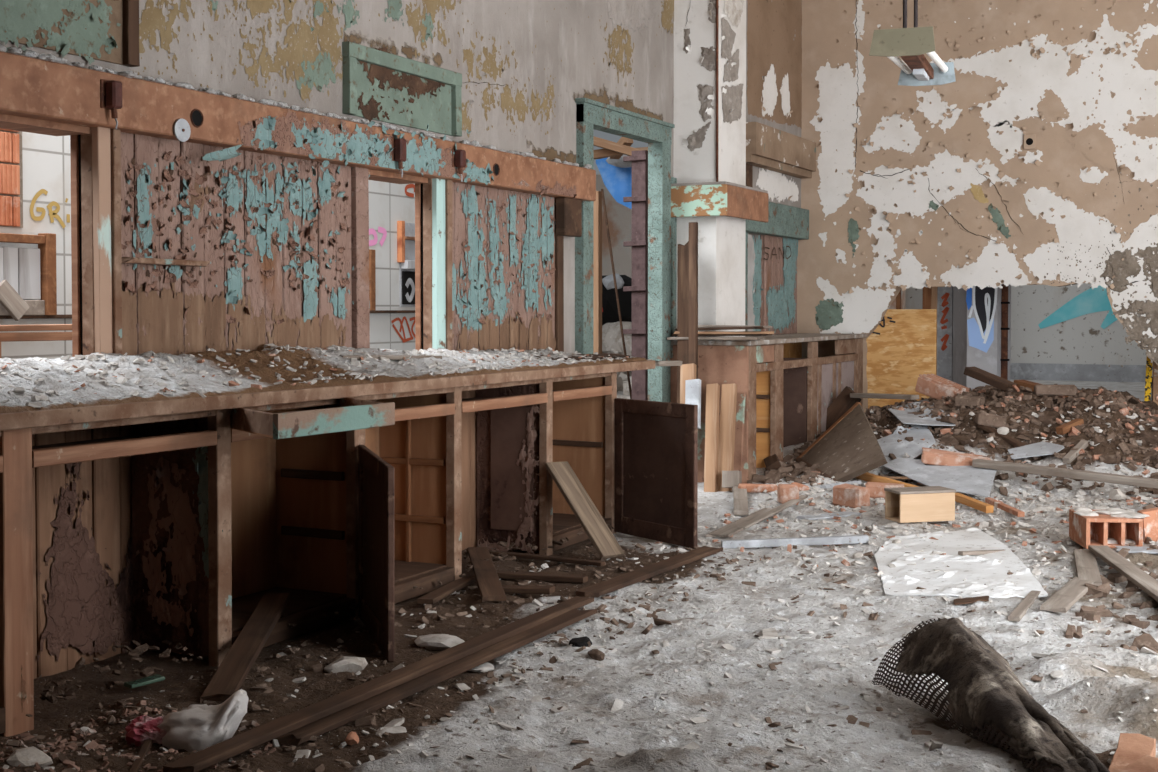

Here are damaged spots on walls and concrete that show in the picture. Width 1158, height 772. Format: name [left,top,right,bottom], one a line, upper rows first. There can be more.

peeling [0,0,121,65]
peeling [588,15,640,98]
spalling [648,0,744,151]
peeling [761,64,793,118]
peeling [121,0,577,356]
peeling [756,168,800,202]
peeling [752,235,798,333]
peeling [36,446,209,663]